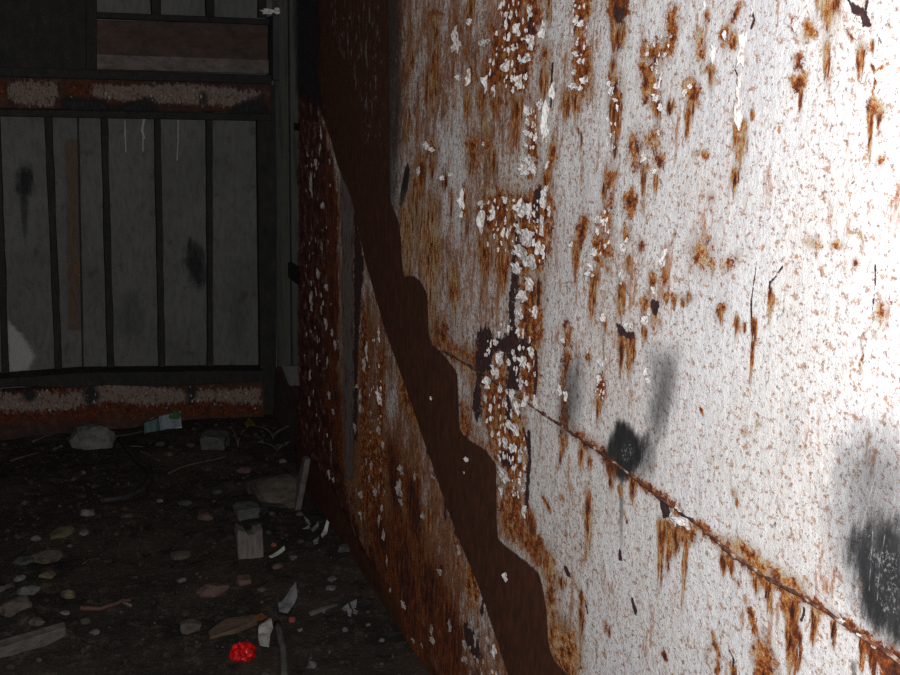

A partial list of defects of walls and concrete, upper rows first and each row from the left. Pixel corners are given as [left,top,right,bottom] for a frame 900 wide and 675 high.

corrosion [790,0,840,113]
corrosion [562,87,597,151]
corrosion [568,0,716,325]
corrosion [866,96,885,165]
corrosion [295,0,588,675]
peeling [471,0,557,518]
crack [529,344,538,410]
crack [532,279,540,319]
corrosion [689,232,740,274]
corrosion [715,302,758,384]
corrosion [584,484,594,560]
corrosion [695,517,900,675]